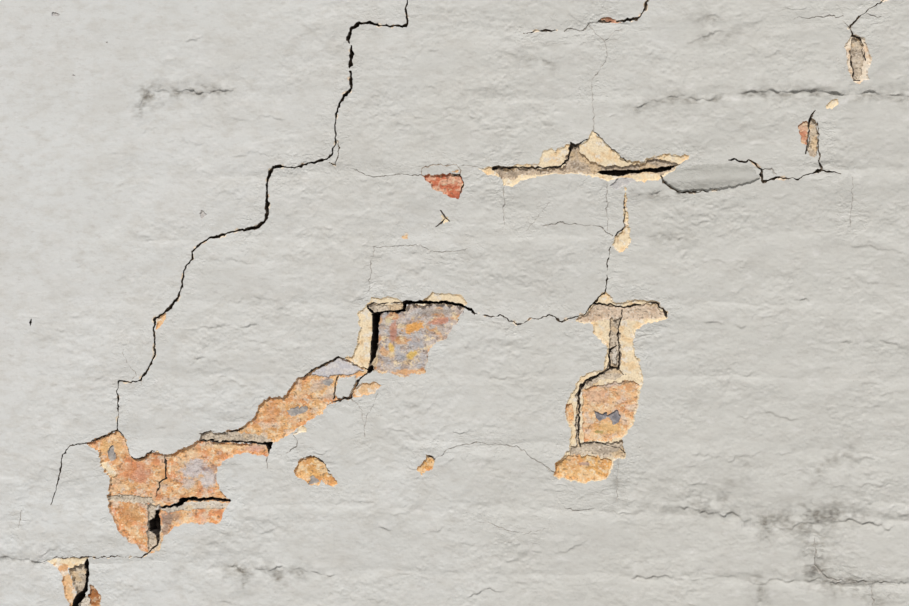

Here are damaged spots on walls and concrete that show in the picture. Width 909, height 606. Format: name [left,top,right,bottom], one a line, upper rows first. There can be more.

crack [523,0,650,132]
crack [116,0,422,431]
spalling [421,164,464,199]
crack [476,187,613,326]
spalling [478,130,689,253]
crack [660,175,717,194]
crack [728,158,853,226]
spalling [798,99,839,169]
crack [51,442,87,504]
spalling [86,291,476,555]
spalling [553,292,668,484]
spalling [44,556,101,606]